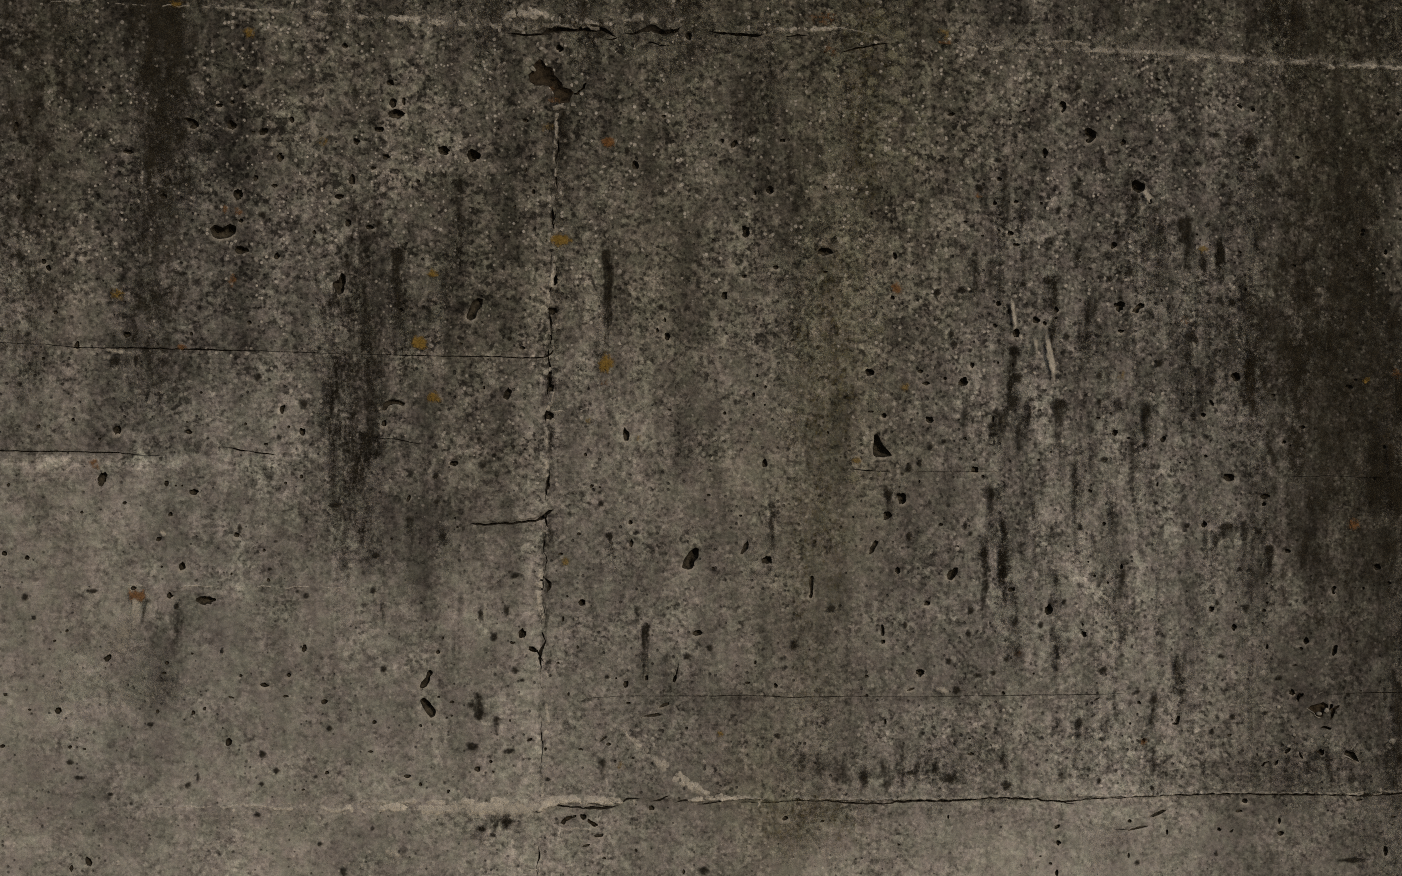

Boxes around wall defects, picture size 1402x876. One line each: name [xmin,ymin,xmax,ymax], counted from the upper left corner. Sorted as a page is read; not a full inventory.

water stain [970,171,1030,297]
water stain [317,203,448,545]
water stain [963,398,1063,448]
water stain [1007,346,1032,391]
water stain [1115,0,1402,659]
water stain [981,481,1062,611]
water stain [1171,655,1194,703]
water stain [881,741,937,788]